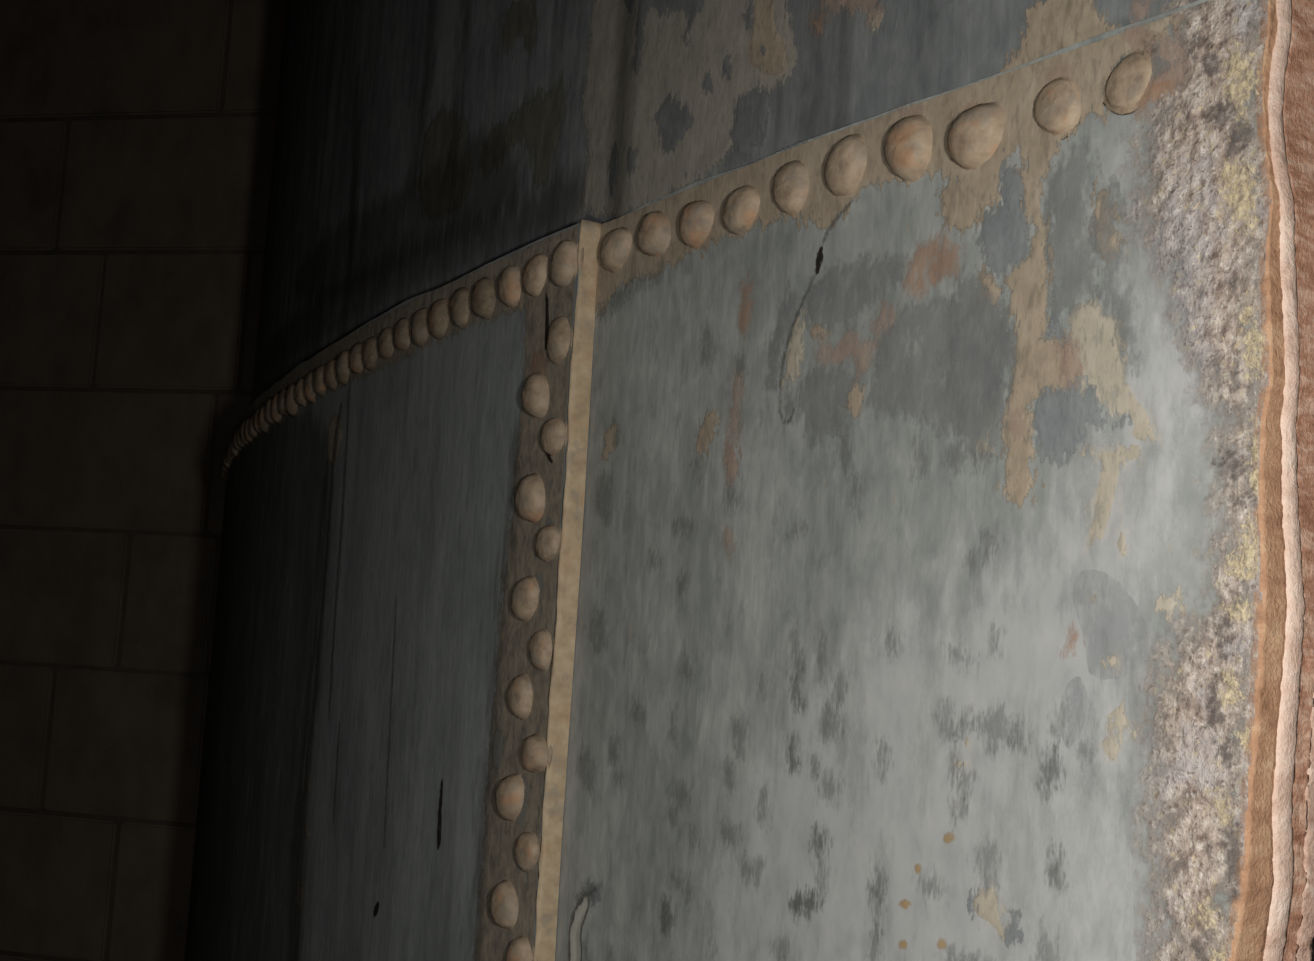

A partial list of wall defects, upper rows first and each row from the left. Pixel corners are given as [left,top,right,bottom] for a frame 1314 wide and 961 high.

crack [815,247,823,275]
crack [780,308,807,389]
peeling [239,0,1187,961]